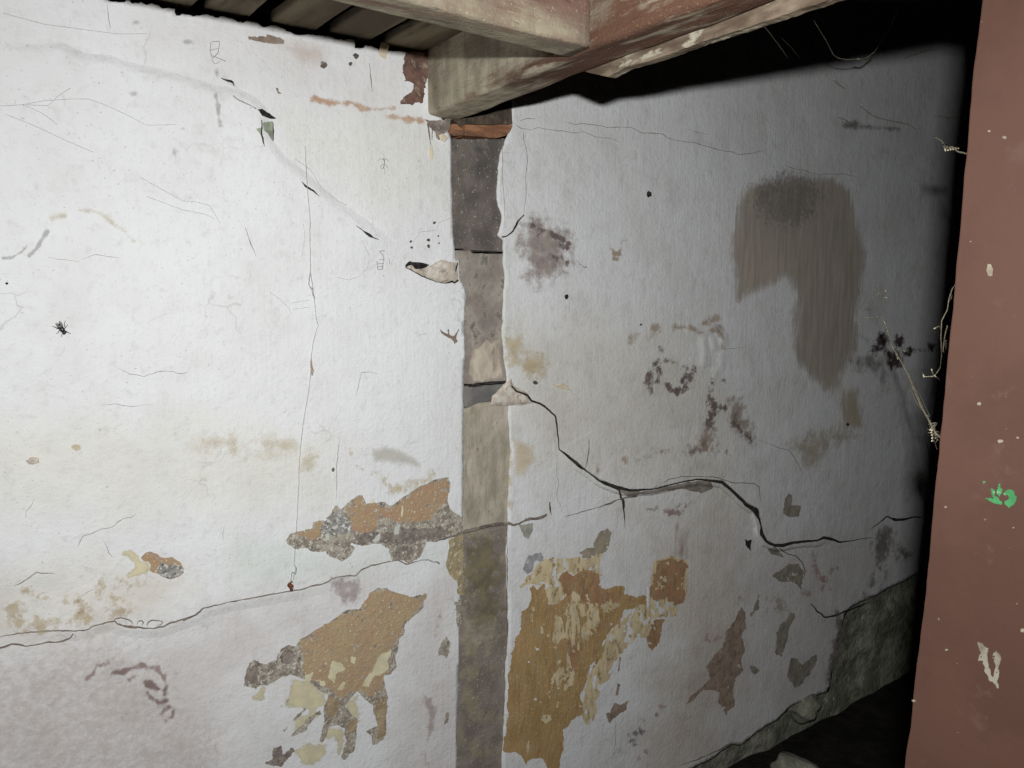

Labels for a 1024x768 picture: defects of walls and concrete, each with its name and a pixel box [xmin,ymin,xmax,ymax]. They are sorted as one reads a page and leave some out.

damp [518,218,571,276]
damp [734,179,934,388]
peeling [122,550,184,579]
peeling [286,477,464,628]
crack [0,386,921,649]
peeling [243,588,427,767]
peeling [503,528,689,768]
peeling [687,595,760,715]
peeling [775,613,817,688]